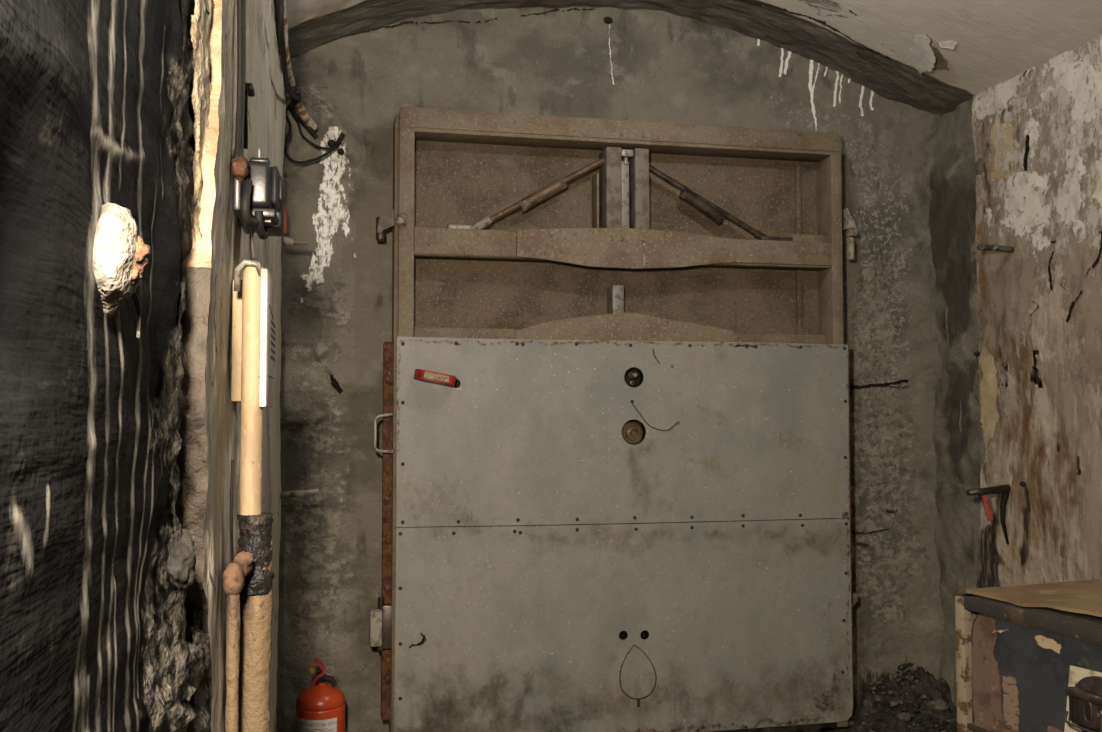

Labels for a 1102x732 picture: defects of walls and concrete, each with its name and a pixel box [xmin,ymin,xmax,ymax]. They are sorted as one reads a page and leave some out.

efflorescence [300,126,354,303]
peeling [909,34,958,74]
peeling [972,32,1102,261]
damp [762,48,928,634]
peeling [979,350,1001,453]
damp [928,96,1102,588]
damp [279,459,359,664]